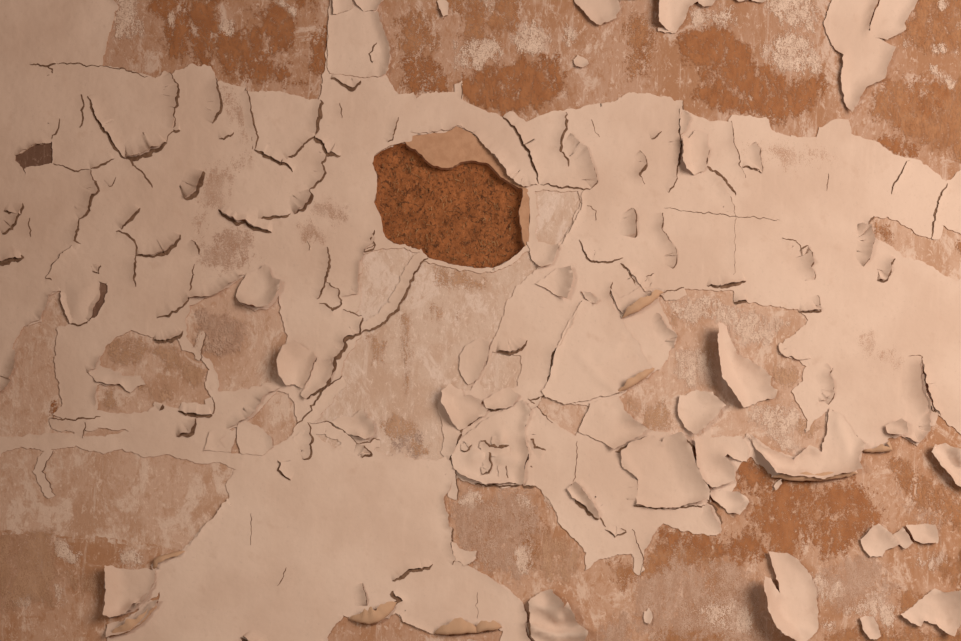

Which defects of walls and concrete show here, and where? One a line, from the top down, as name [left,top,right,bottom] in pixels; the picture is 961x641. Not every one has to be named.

crack [0,201,32,266]
peeling [12,137,56,179]
crack [30,54,206,361]
peeling [0,285,236,641]
crack [153,397,215,437]
crack [203,43,380,233]
crack [277,241,428,480]
peeling [84,119,961,641]
peeling [99,0,961,234]
crack [441,100,822,500]
crack [600,440,722,575]
crack [856,212,895,283]